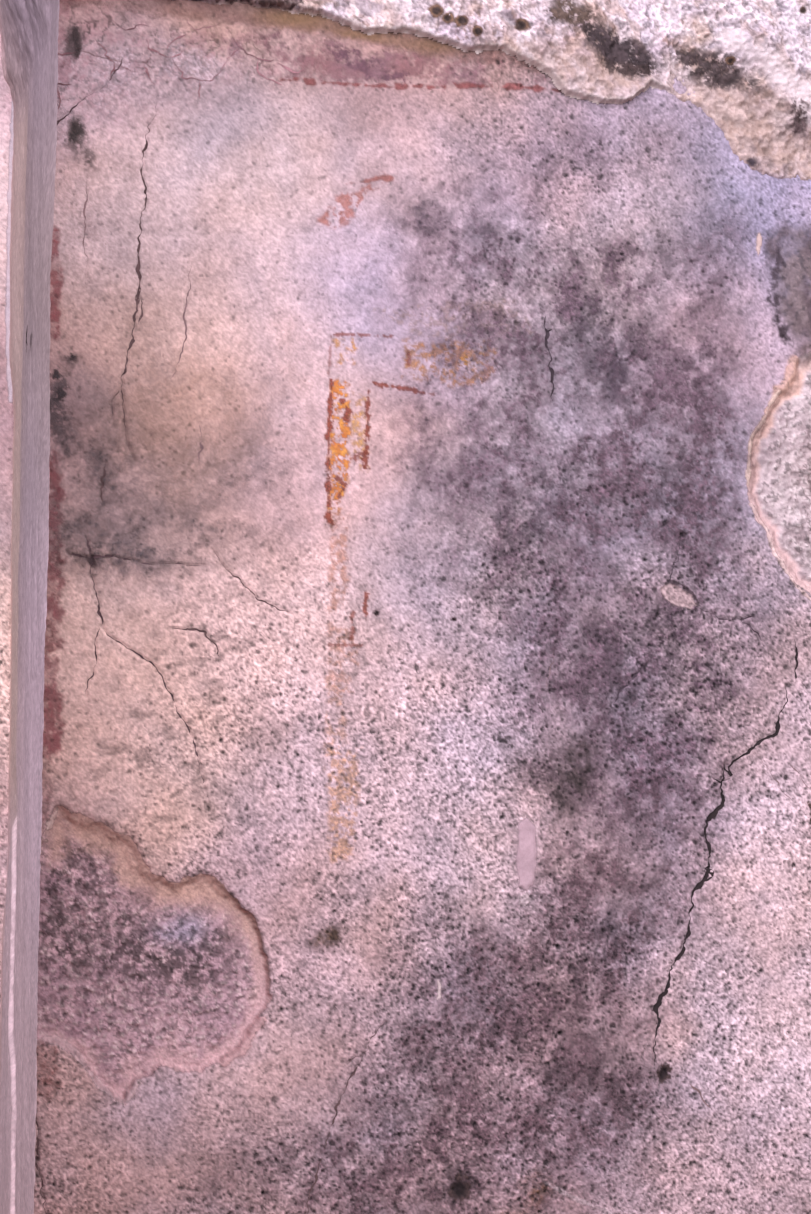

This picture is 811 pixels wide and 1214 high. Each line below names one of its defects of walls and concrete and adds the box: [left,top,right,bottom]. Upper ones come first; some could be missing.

peeling [43,456,64,752]
peeling [50,229,63,339]
crack [68,539,285,783]
crack [57,19,304,506]
flaking render [172,0,811,181]
leakage [403,203,745,846]
spalling [746,230,811,600]
spalling [37,796,272,1104]
leakage [295,841,688,1214]
crack [653,640,805,1061]